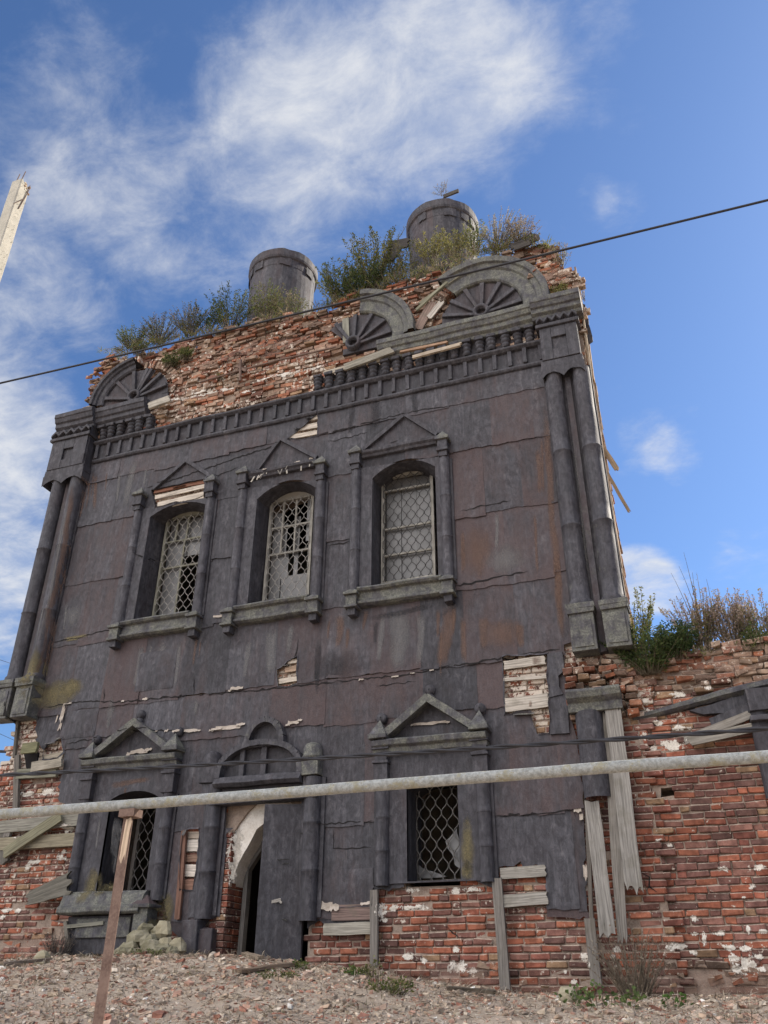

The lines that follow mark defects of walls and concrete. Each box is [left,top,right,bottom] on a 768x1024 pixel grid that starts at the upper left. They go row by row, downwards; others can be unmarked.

peeling [170,365,322,401]
peeling [287,410,319,440]
crack [318,406,447,443]
peeling [152,476,208,508]
crack [456,572,524,586]
crack [3,639,558,730]
peeling [276,655,299,688]
peeling [501,652,551,736]
peeling [226,828,244,885]